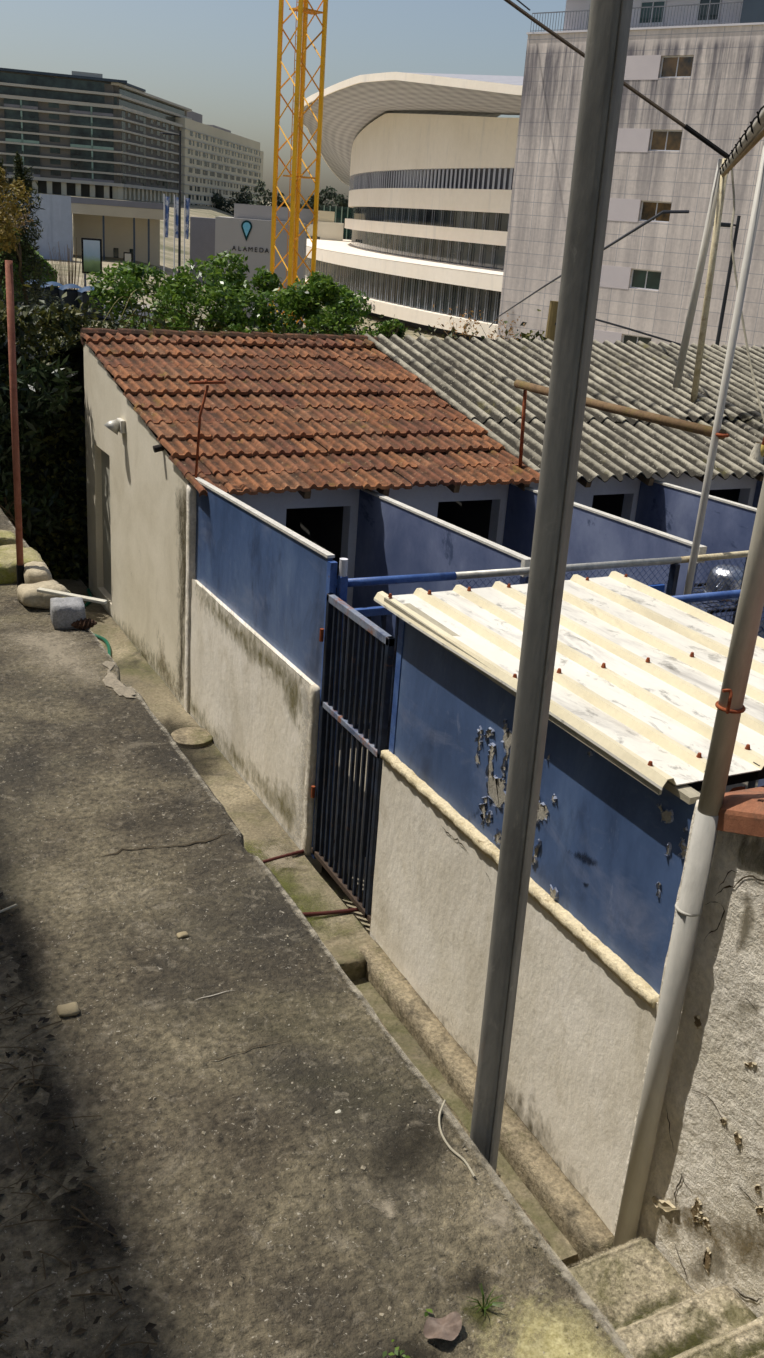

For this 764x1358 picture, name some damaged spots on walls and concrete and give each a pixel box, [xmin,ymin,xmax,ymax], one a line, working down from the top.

peeling [474,719,512,845]
peeling [531,794,557,865]
crack [705,870,764,938]
leakage [739,896,750,948]